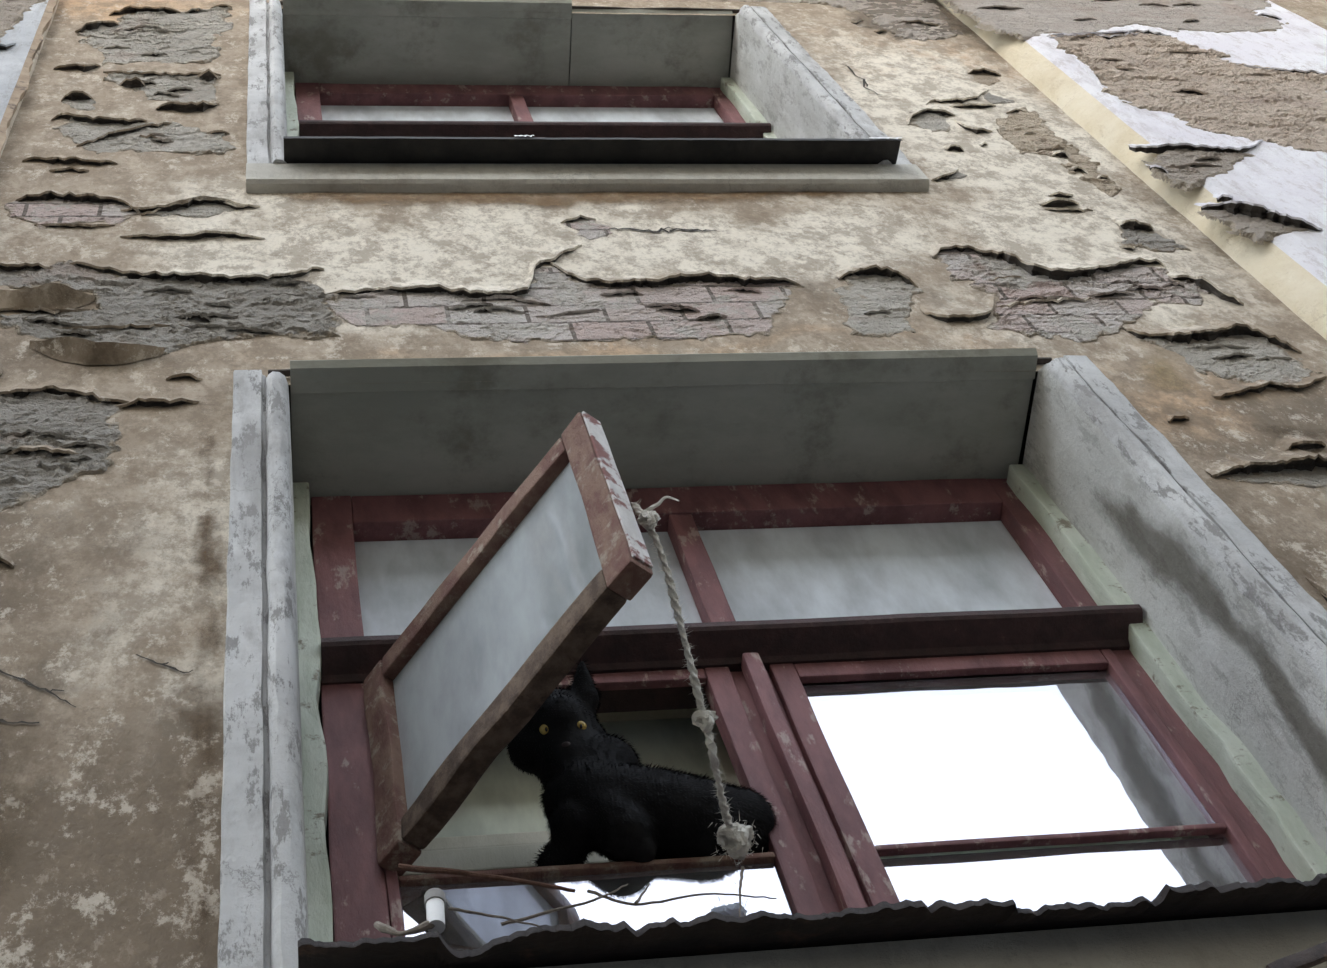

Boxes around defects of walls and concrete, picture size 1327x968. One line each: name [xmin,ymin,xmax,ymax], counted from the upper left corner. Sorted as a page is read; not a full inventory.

spalling [0,0,59,50]
spalling [22,4,237,173]
spalling [706,0,1327,245]
spalling [4,190,265,240]
spalling [0,215,805,365]
spalling [833,217,1327,399]
spalling [0,363,202,512]
peeling [1275,434,1326,451]